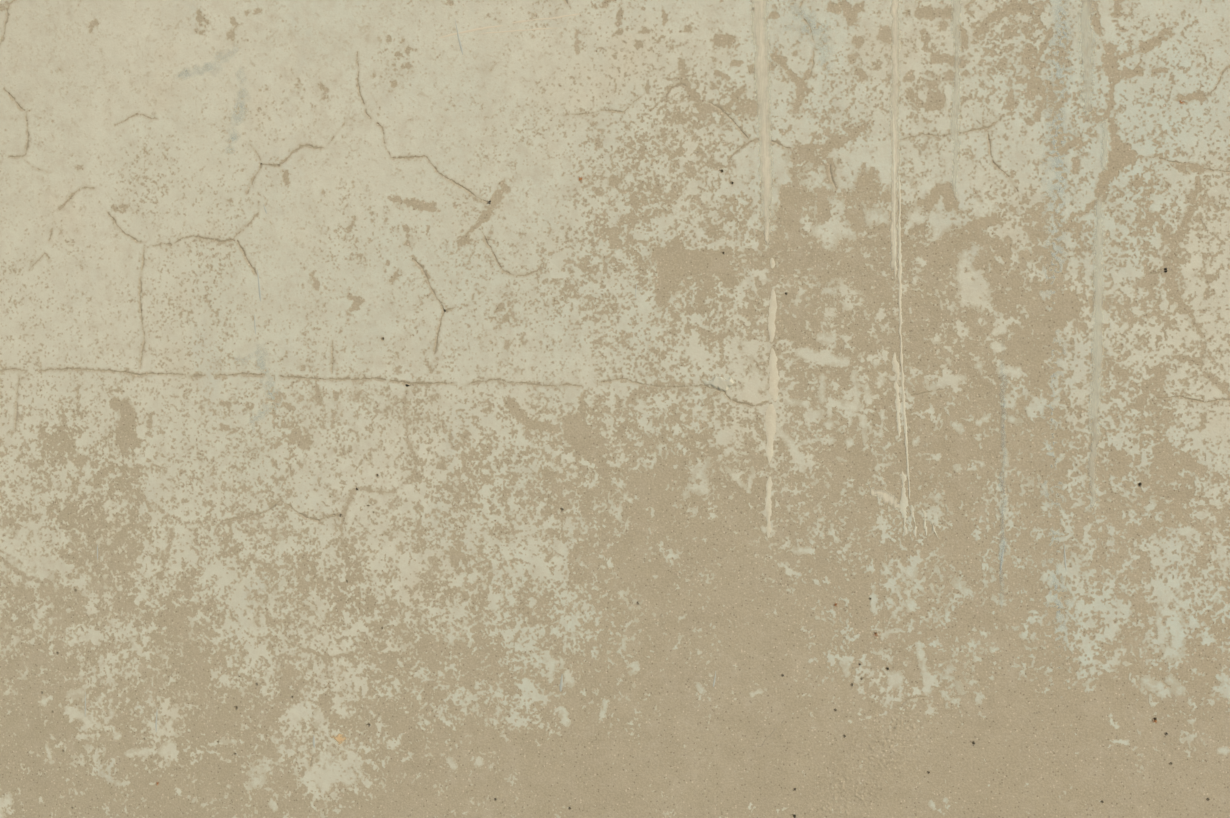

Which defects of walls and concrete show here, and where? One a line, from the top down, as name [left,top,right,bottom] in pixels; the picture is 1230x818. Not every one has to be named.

crack [0,0,15,44]
peeling [768,48,836,146]
crack [903,114,1018,192]
peeling [898,0,1084,126]
crack [1202,65,1230,98]
crack [0,52,793,572]
peeling [681,191,754,242]
leakage [870,0,938,537]
peeling [1101,165,1186,353]
crack [1141,155,1230,333]
leakage [765,289,780,538]
spalling [803,701,934,818]